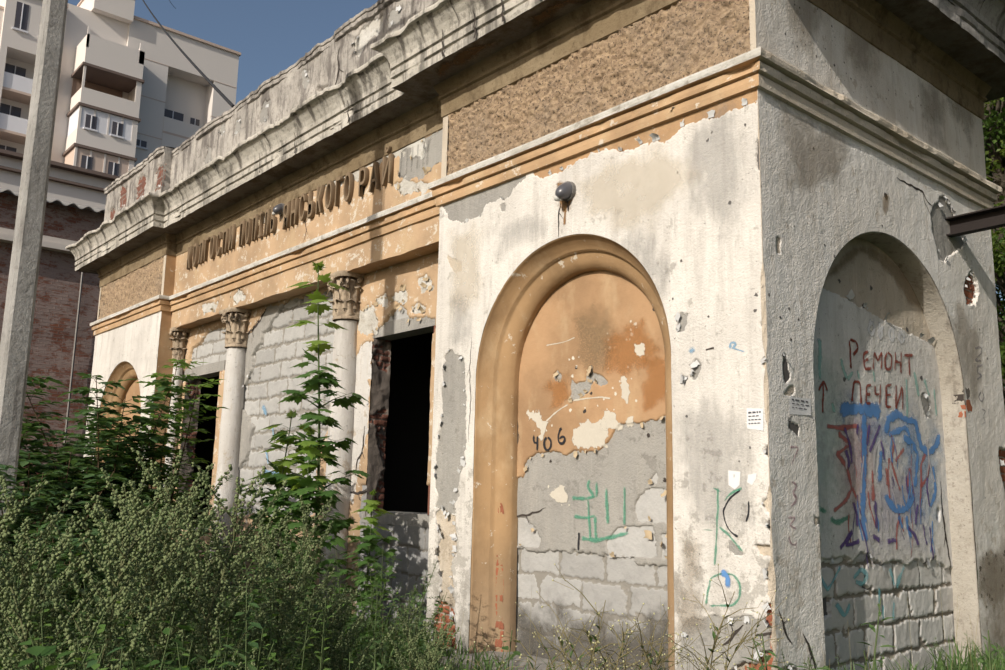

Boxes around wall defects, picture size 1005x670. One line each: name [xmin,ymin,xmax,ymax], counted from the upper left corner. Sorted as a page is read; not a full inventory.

peeling [316,129,443,197]
peeling [443,89,757,223]
crack [898,178,931,215]
flaking render [930,196,967,262]
flaking render [964,272,977,306]
peeling [350,274,434,504]
peeling [680,359,702,385]
peeling [782,353,794,396]
flaking render [431,350,467,649]
flaking render [516,356,668,651]
flaking render [678,592,799,670]
flaking render [821,553,956,670]